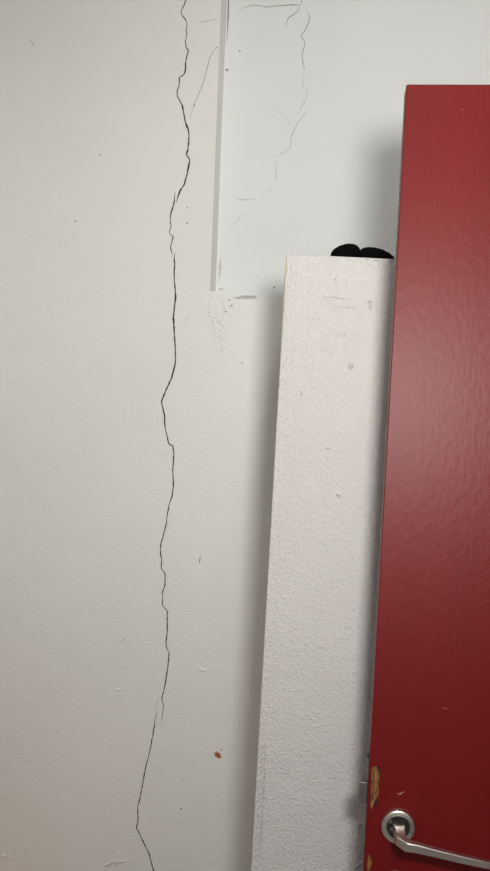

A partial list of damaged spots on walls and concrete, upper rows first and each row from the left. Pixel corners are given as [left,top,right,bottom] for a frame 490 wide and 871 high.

crack [136,0,310,871]